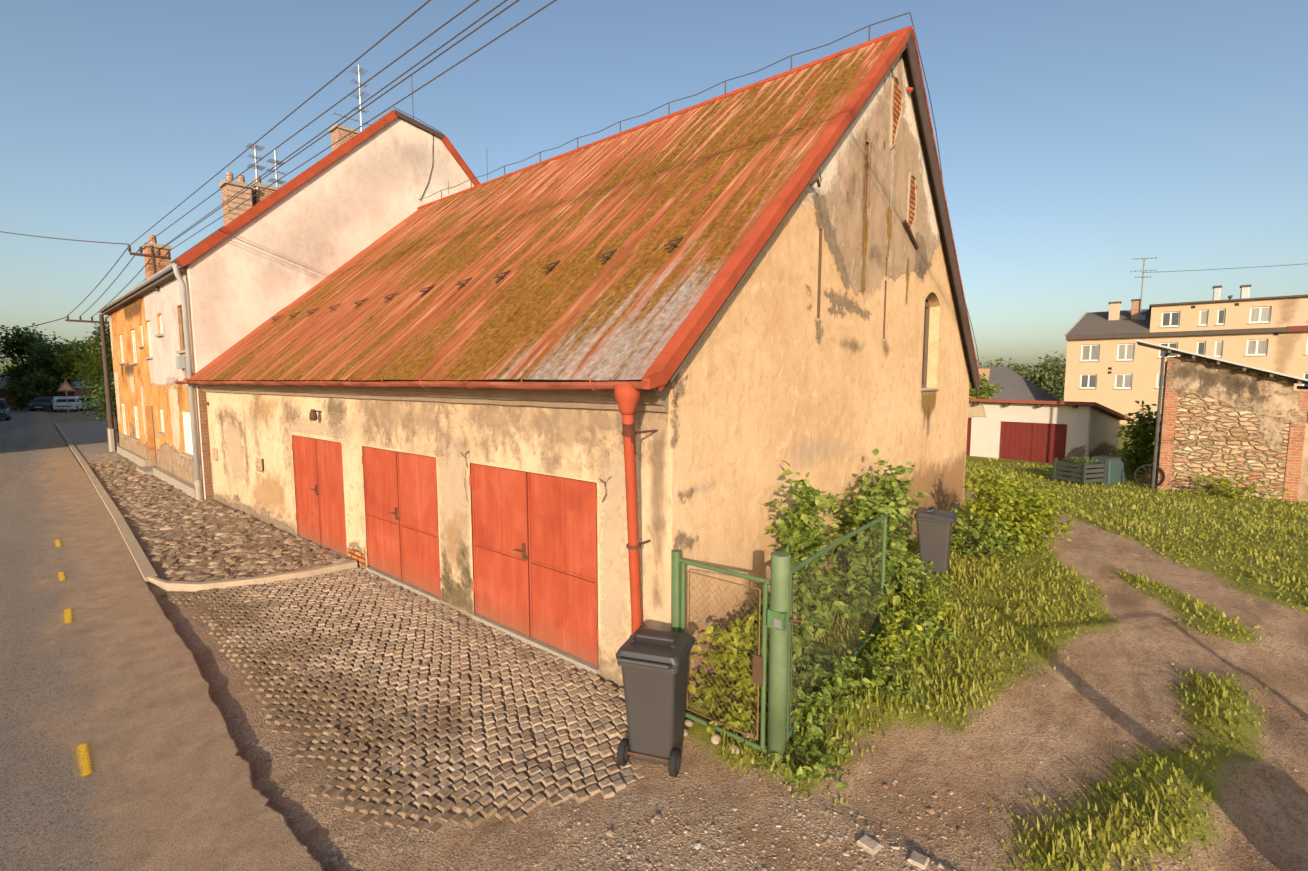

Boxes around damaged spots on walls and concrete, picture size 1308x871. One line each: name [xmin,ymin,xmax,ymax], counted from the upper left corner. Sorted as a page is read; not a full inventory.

corrosion [862,134,871,293]
flaking render [801,53,941,344]
water stain [922,392,936,428]
water stain [441,548,473,614]